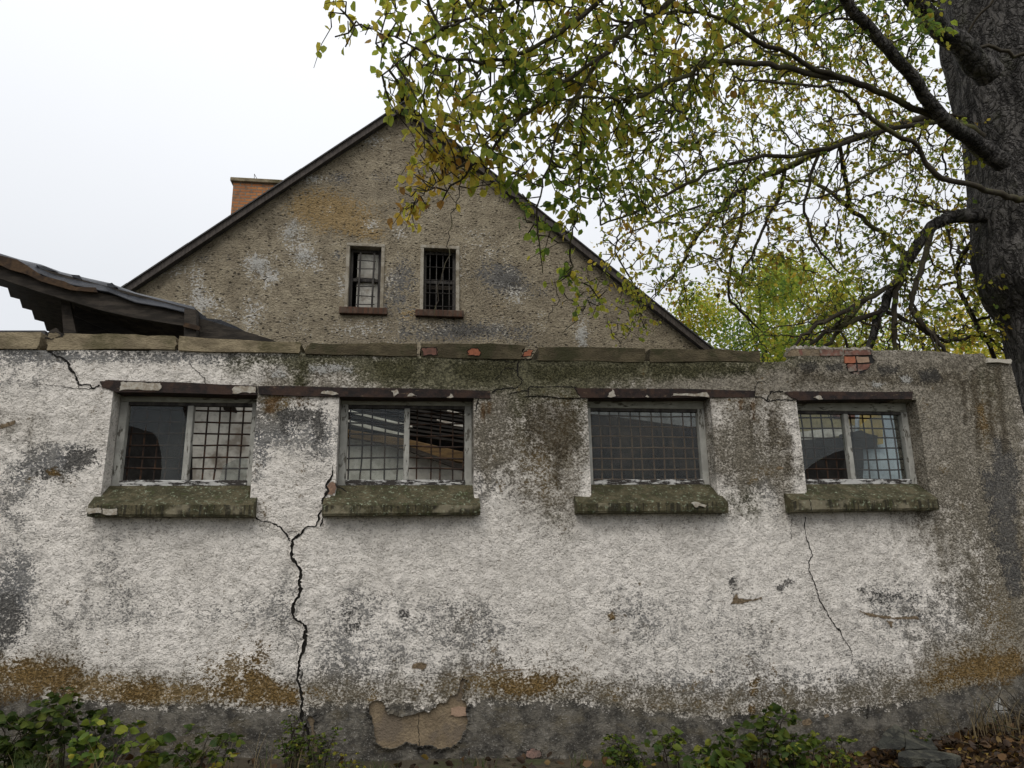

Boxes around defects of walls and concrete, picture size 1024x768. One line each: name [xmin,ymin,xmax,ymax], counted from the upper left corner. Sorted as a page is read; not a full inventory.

crack [30,333,103,390]
crack [467,347,579,412]
flaking render [783,345,877,378]
damp [30,444,100,482]
damp [978,432,1024,598]
damp [0,586,31,651]
crack [252,466,347,761]
peeling [731,594,762,604]
crack [790,499,853,664]
flaking render [364,667,552,753]